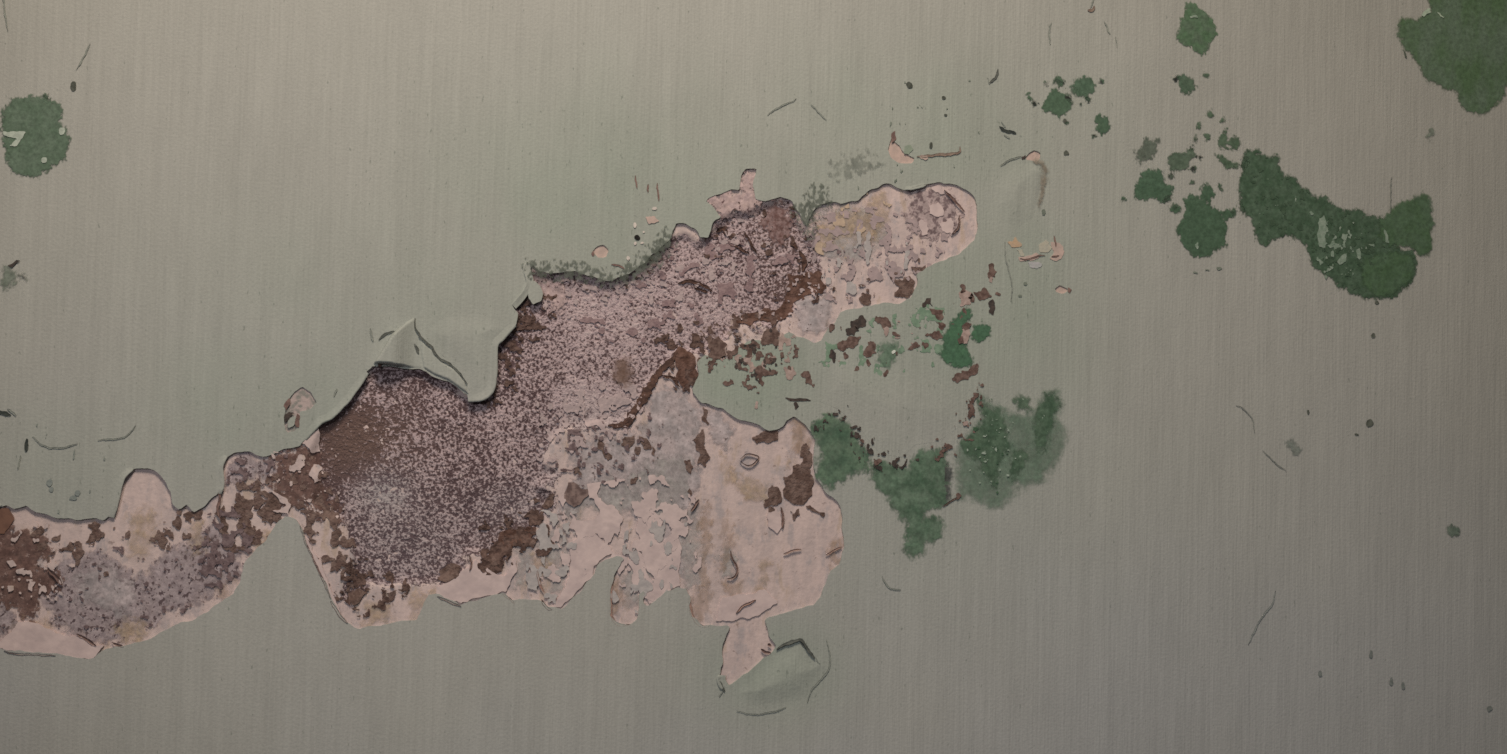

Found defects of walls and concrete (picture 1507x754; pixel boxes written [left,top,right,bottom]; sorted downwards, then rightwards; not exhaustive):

spalling [0,169,1001,690]
leakage [811,392,1062,558]